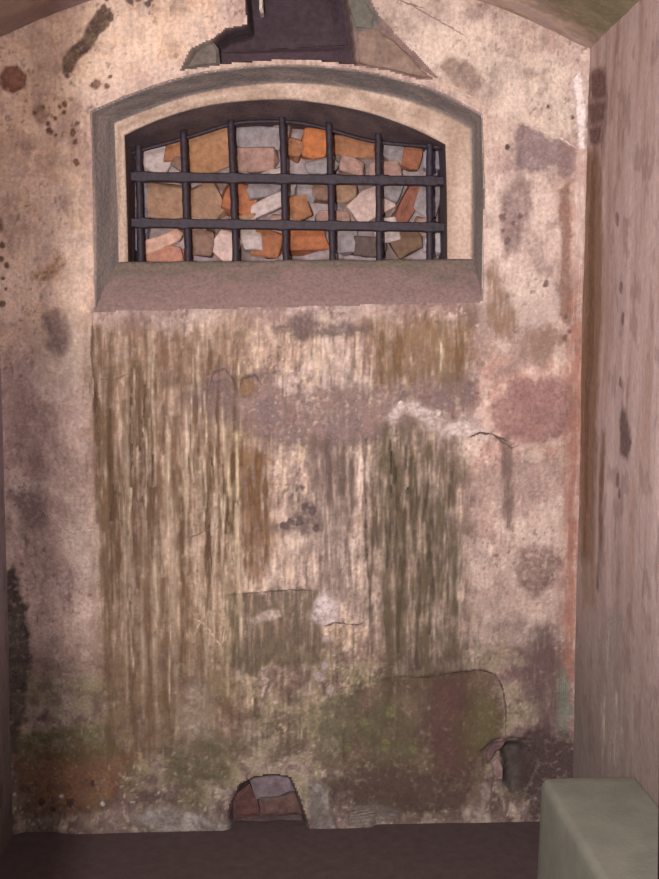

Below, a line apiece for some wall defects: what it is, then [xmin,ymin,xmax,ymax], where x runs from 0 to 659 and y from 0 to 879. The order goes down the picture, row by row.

spalling [180,0,488,173]
damp [485,271,560,335]
damp [36,312,487,726]
damp [522,550,560,594]
spalling [225,774,310,828]